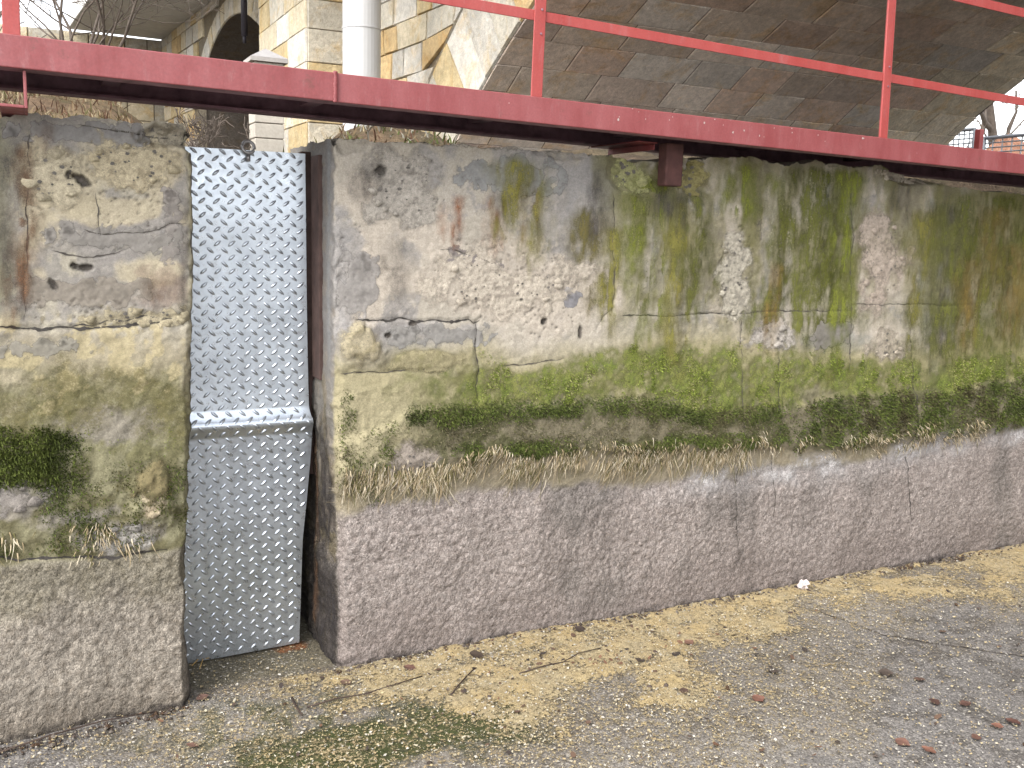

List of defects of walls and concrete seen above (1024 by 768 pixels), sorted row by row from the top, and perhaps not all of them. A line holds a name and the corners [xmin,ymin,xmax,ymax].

spalling [355,142,471,229]
corrosion [16,217,35,298]
crack [0,135,185,332]
leakage [588,274,608,315]
spalling [713,232,752,327]
spalling [857,214,915,361]
crack [340,368,405,376]
crack [357,317,479,392]
crack [600,181,973,546]